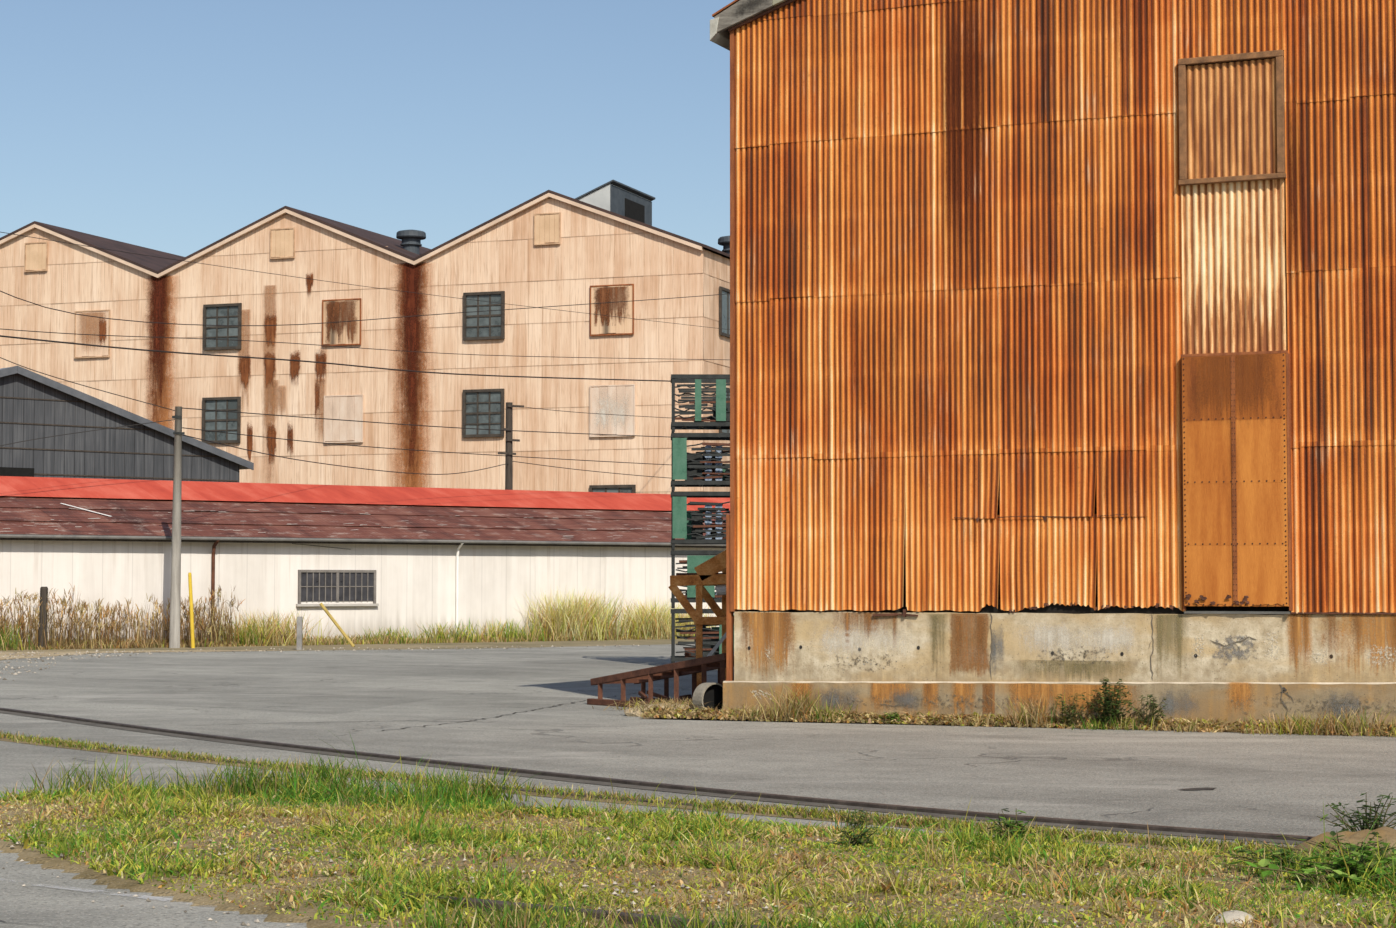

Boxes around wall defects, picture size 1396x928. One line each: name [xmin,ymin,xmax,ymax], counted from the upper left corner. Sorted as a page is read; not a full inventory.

corrosion [946,24,980,221]
corrosion [1290,131,1308,234]
corrosion [149,275,174,428]
corrosion [238,285,357,477]
corrosion [397,263,428,487]
corrosion [595,286,626,325]
corrosion [872,613,1132,716]
corrosion [1185,594,1249,605]
corrosion [1288,614,1396,670]